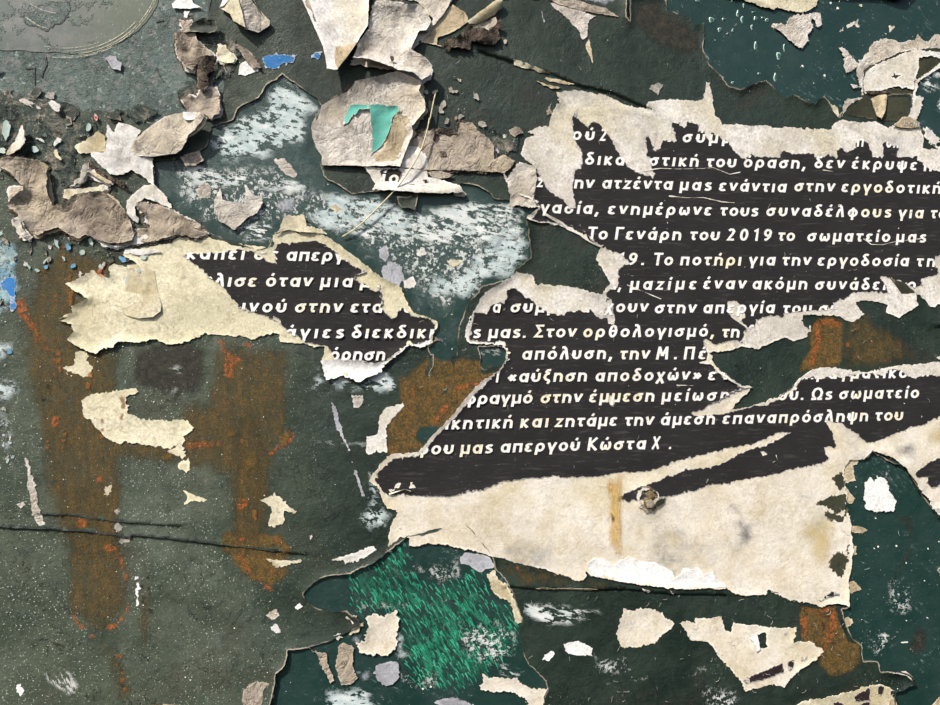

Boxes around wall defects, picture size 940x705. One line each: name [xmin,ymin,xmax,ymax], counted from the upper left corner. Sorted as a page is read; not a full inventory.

peeling [0,87,159,196]
peeling [177,31,241,98]
peeling [666,0,940,116]
peeling [912,68,940,145]
peeling [154,75,530,386]
corrosion [800,316,903,371]
corrosion [16,245,294,637]
corrosion [387,358,498,455]
crack [0,512,282,553]
peeling [587,556,726,589]
peeling [842,452,940,705]
corrosion [800,604,859,676]